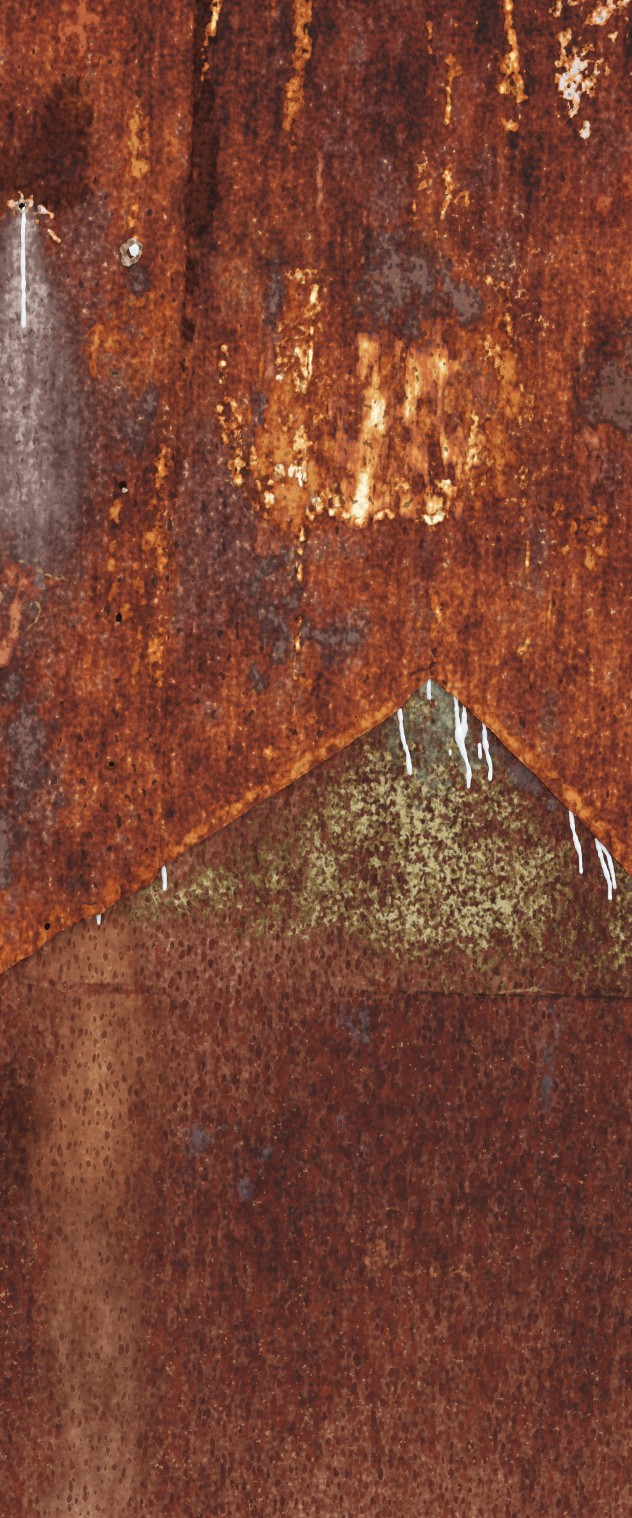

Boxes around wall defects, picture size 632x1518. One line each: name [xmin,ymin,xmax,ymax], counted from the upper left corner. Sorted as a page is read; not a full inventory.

corrosion [201,0,222,81]
corrosion [270,0,312,153]
corrosion [426,20,467,126]
corrosion [496,0,535,136]
corrosion [549,0,632,146]
corrosion [6,190,61,244]
corrosion [411,162,470,238]
water stain [0,80,93,609]
corrosion [215,263,538,561]
corrosion [106,442,170,688]
corrosion [516,424,631,691]
corrosion [408,587,632,874]